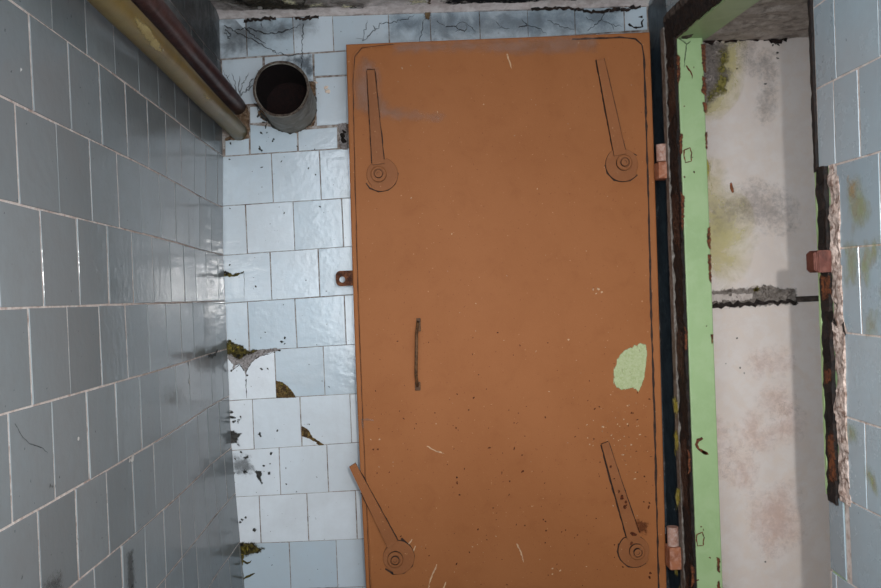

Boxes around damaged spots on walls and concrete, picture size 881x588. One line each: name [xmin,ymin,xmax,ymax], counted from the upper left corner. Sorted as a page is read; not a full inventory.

crack [224,24,304,69]
water stain [220,0,366,11]
crack [357,15,474,41]
crack [496,13,644,35]
crack [223,70,261,111]
water stain [704,42,734,110]
water stain [709,204,733,260]
spalling [817,164,852,507]
spalling [227,348,281,398]
spalling [276,381,296,398]
spalling [301,426,324,445]